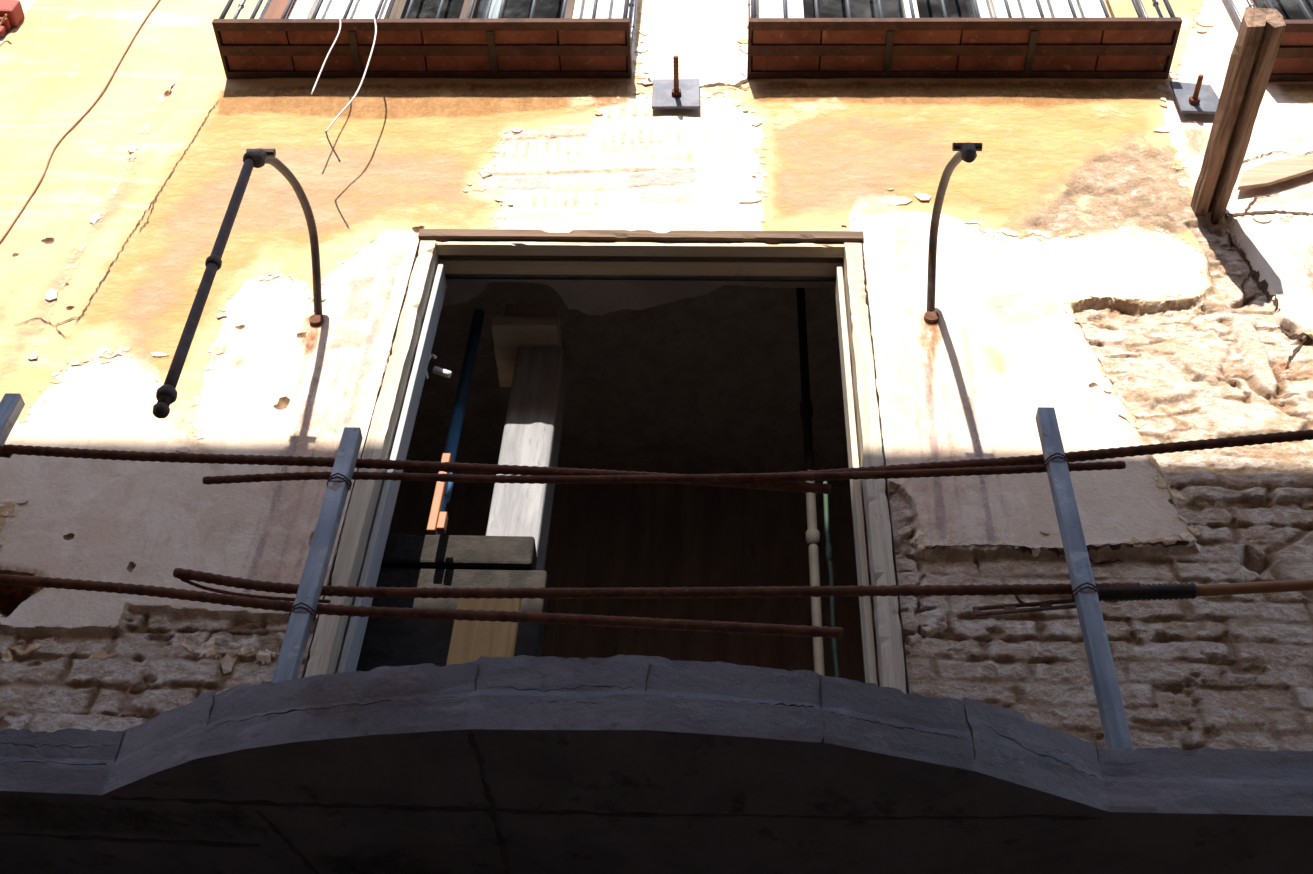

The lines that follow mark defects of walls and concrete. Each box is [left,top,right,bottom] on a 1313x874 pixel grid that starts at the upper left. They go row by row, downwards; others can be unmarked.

peeling [39,80,175,329]
peeling [0,226,671,732]
peeling [298,0,1313,751]